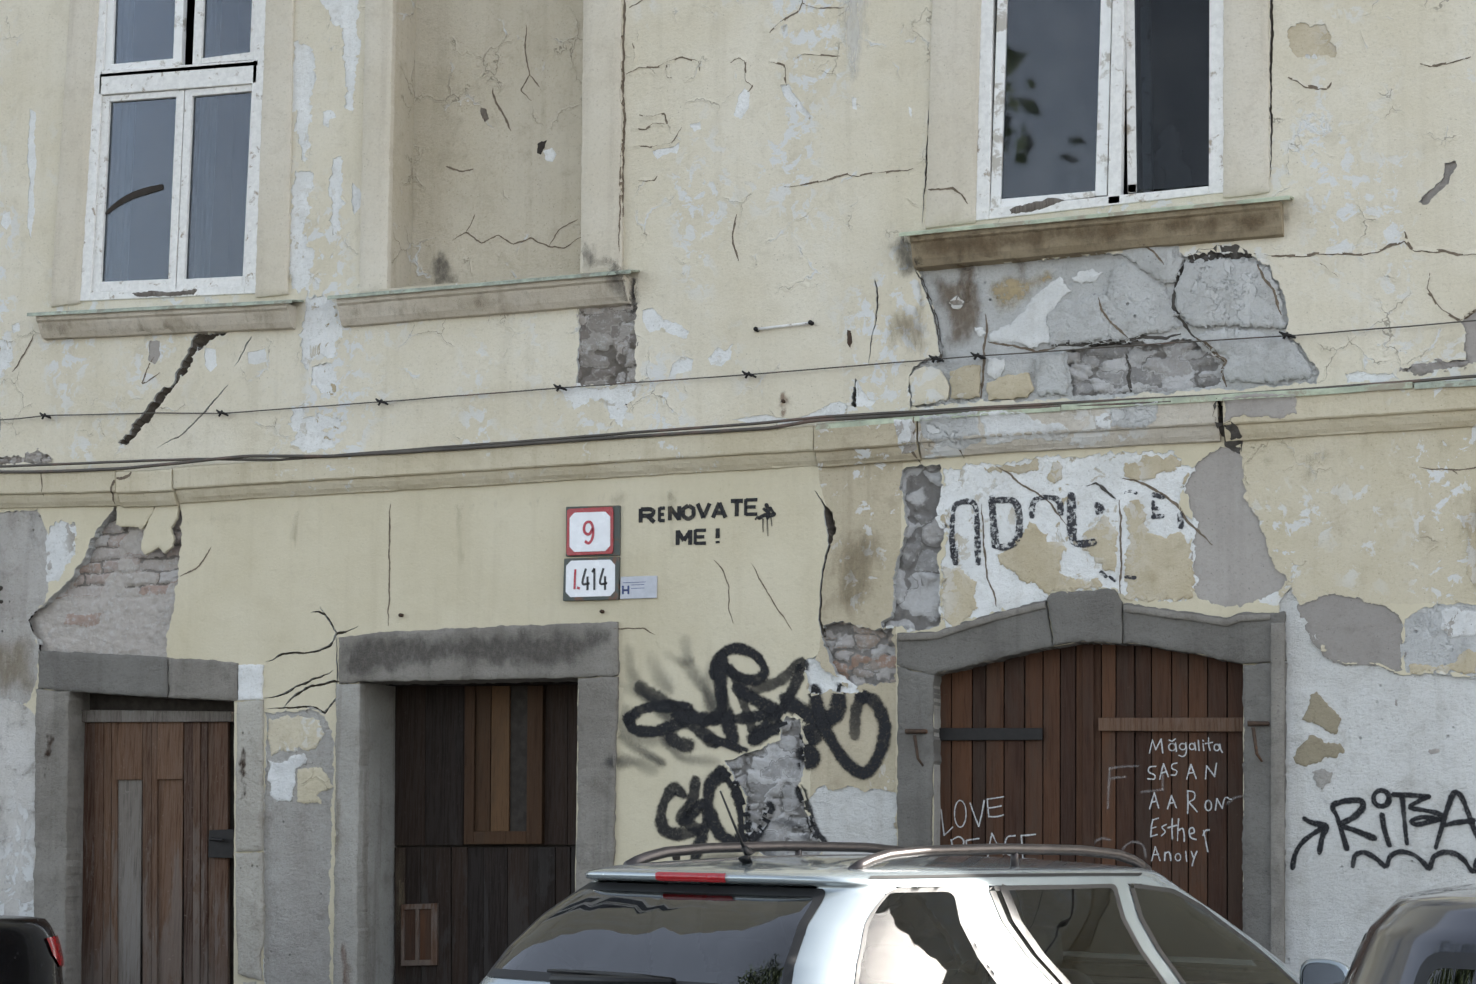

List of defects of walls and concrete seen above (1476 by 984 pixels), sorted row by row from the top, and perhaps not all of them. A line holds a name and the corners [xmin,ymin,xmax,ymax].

crack [618,0,844,251]
crack [1270,0,1332,177]
peeling [288,0,362,453]
crack [110,333,225,504]
spalling [559,278,733,427]
spalling [0,506,182,704]
crack [269,611,350,714]
crack [385,504,393,625]
crack [714,492,836,638]
peeling [805,254,1476,977]
peeling [264,706,335,984]
spalling [726,715,898,856]